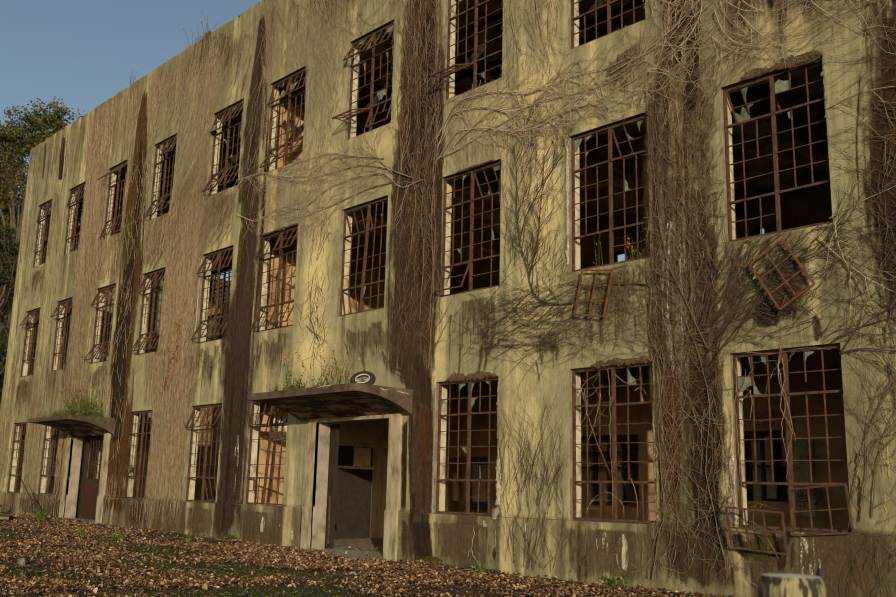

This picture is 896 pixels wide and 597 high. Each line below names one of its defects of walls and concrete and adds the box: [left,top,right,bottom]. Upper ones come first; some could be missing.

leakage [84,92,148,525]
leakage [186,17,286,545]
leakage [345,0,496,561]
leakage [569,529,642,581]
leakage [585,0,821,587]